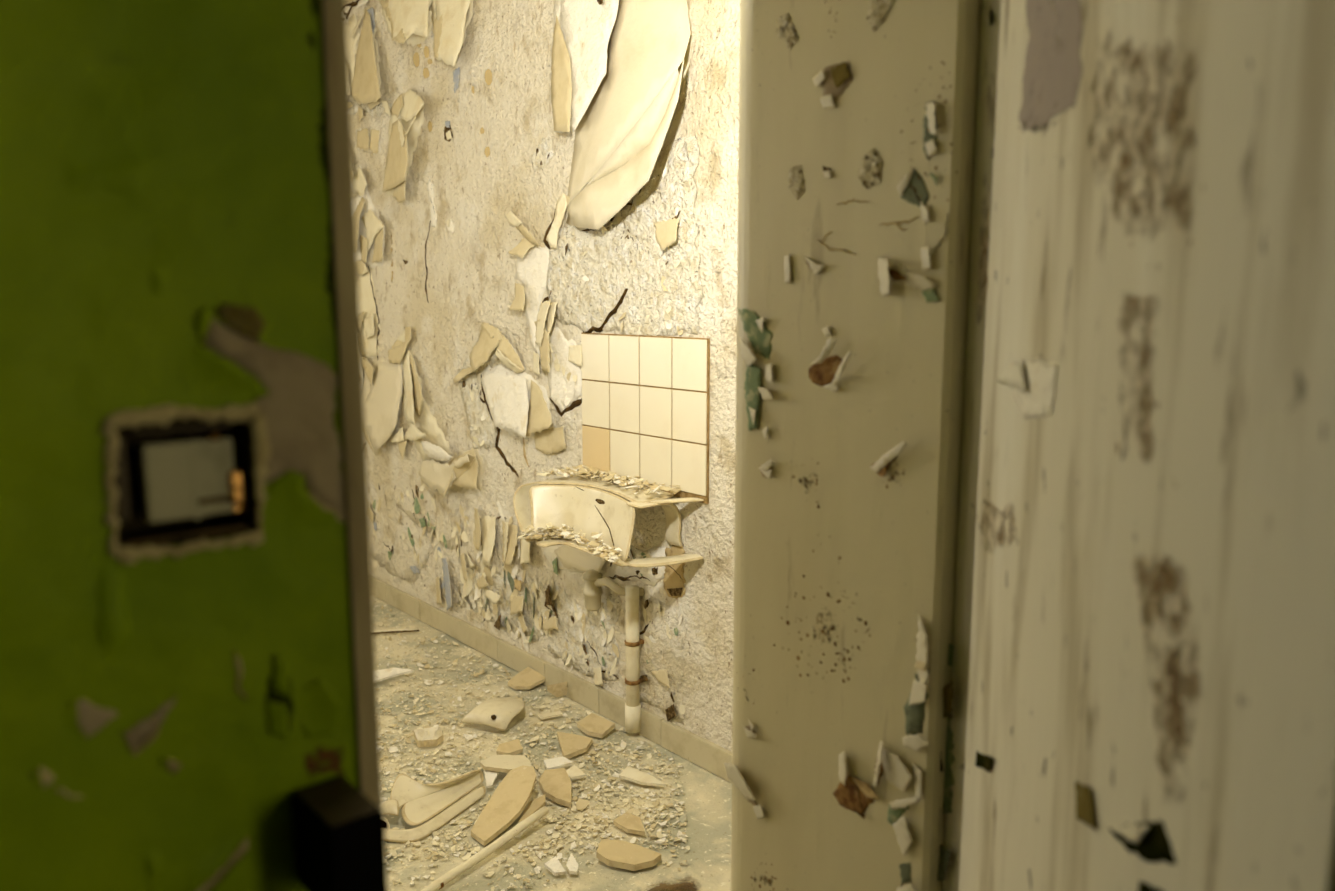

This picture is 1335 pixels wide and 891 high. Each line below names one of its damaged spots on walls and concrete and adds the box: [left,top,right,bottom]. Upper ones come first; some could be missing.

spalling [813,61,853,109]
spalling [858,148,884,189]
peeling [878,101,949,302]
spalling [346,0,704,725]
peeling [737,308,774,440]
peeling [808,326,852,392]
peeling [174,303,347,541]
peeling [724,763,764,819]
peeling [833,614,955,891]
peeling [975,751,993,772]
peeling [1075,781,1177,865]
peeling [1138,881,1162,891]